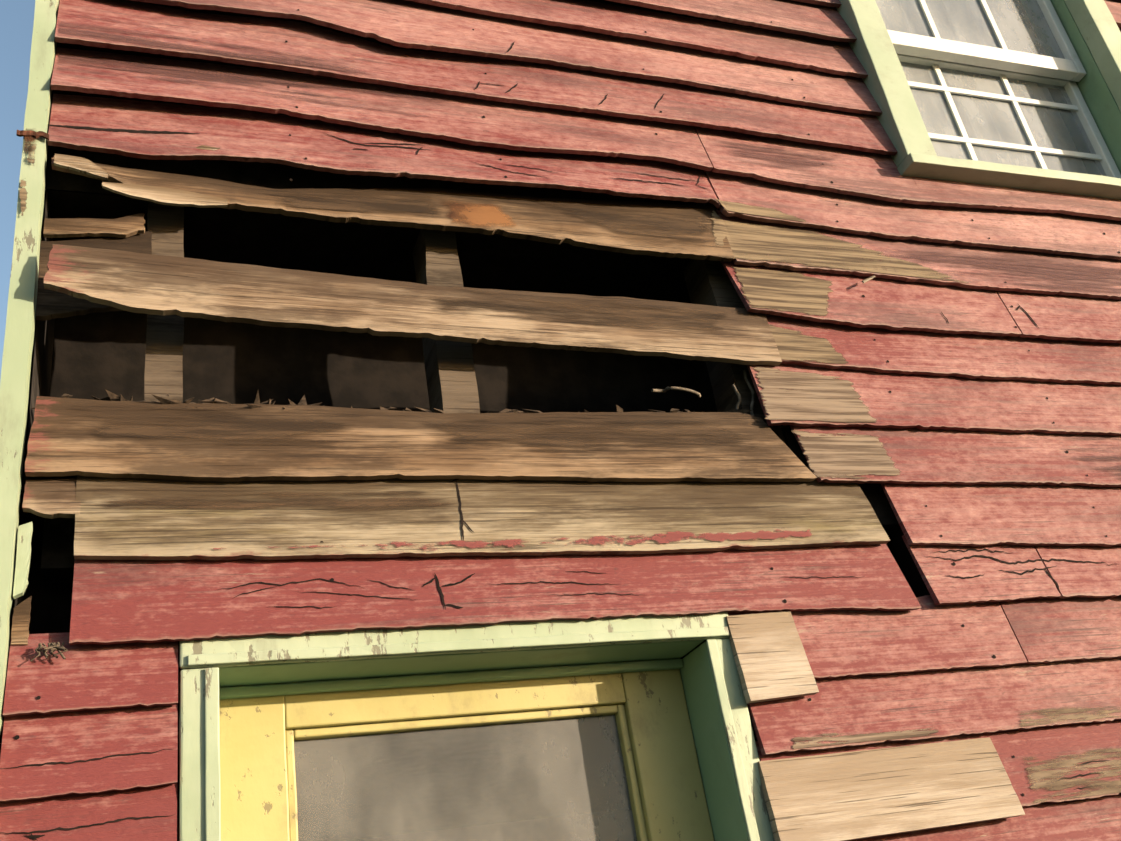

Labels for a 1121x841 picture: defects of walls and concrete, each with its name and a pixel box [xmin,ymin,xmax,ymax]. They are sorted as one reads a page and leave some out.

peeling [19,179,28,216]
spalling [22,154,969,479]
crack [451,479,473,541]
peeling [362,529,812,550]
spalling [8,494,73,660]
crack [218,571,642,610]
crack [925,549,1112,591]
peeling [1024,748,1121,803]